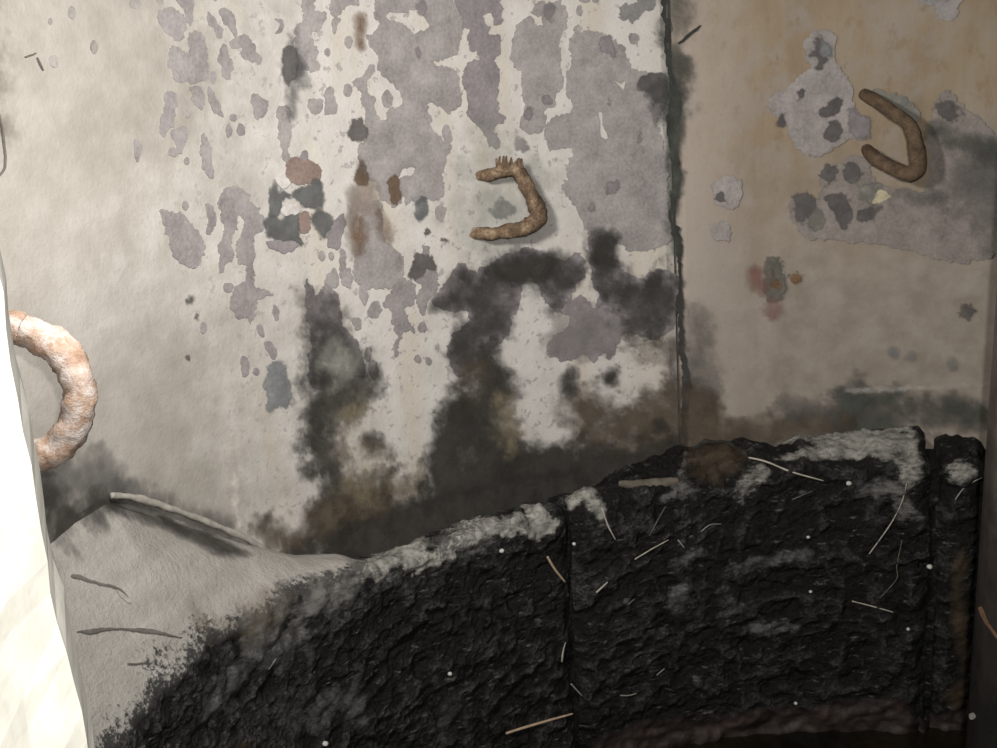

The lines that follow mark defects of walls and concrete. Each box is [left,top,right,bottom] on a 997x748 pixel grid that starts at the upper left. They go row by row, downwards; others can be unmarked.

peeling [156,0,673,359]
damp [638,46,688,254]
crack [660,0,701,136]
peeling [766,29,997,264]
damp [40,448,245,554]
peeling [240,356,260,377]
damp [257,229,988,582]
crack [668,161,693,446]